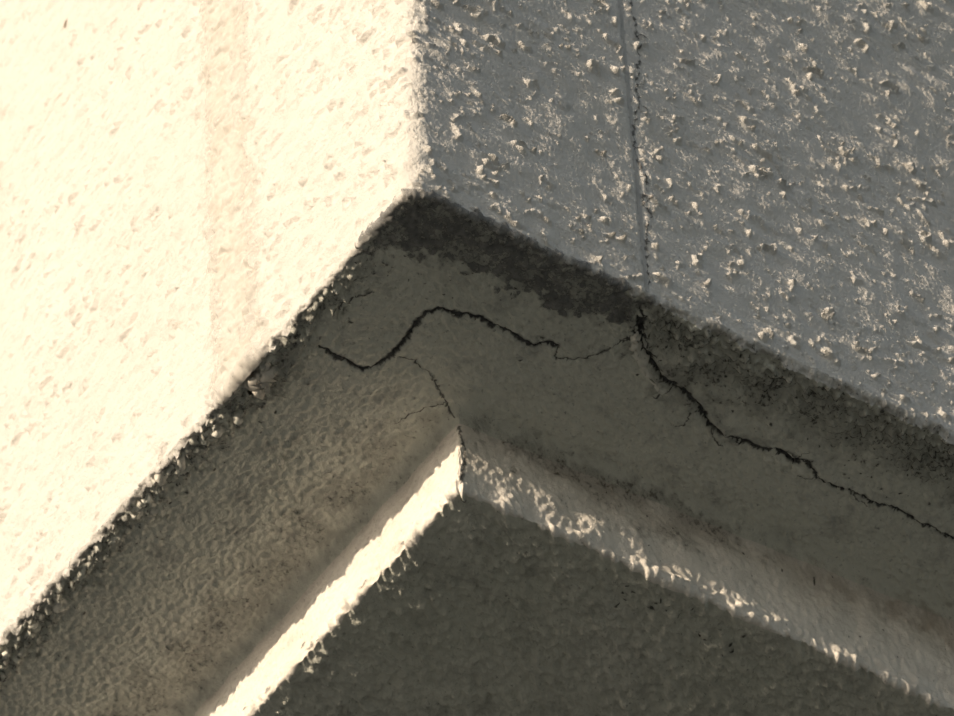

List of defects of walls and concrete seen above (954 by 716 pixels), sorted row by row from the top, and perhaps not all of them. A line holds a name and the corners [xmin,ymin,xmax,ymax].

leakage [270,274,341,367]
crack [319,1,954,539]
leakage [348,189,954,488]
leakage [159,379,286,494]
leakage [85,484,172,571]
leakage [0,562,87,682]